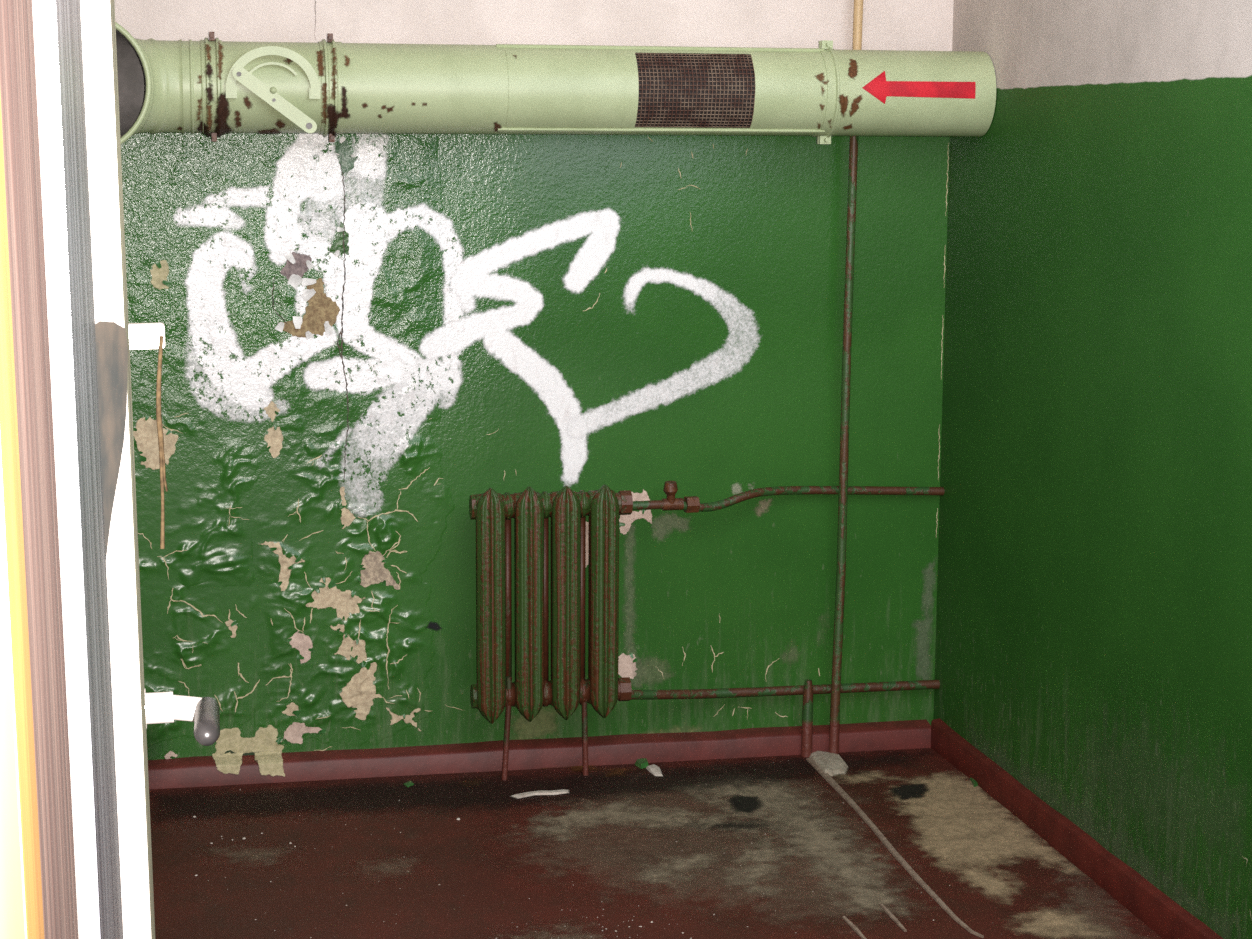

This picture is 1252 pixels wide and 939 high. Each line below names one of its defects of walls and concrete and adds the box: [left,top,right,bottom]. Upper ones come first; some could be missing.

crack [272,276,287,324]
peeling [275,252,340,340]
crack [308,164,349,478]
peeling [133,415,178,470]
peeling [619,489,652,534]
peeling [261,541,305,591]
crack [138,467,461,712]
peeling [286,631,314,663]
peeling [306,551,421,731]
peeling [618,652,638,679]
crack [224,749,265,757]
peeling [212,699,326,777]